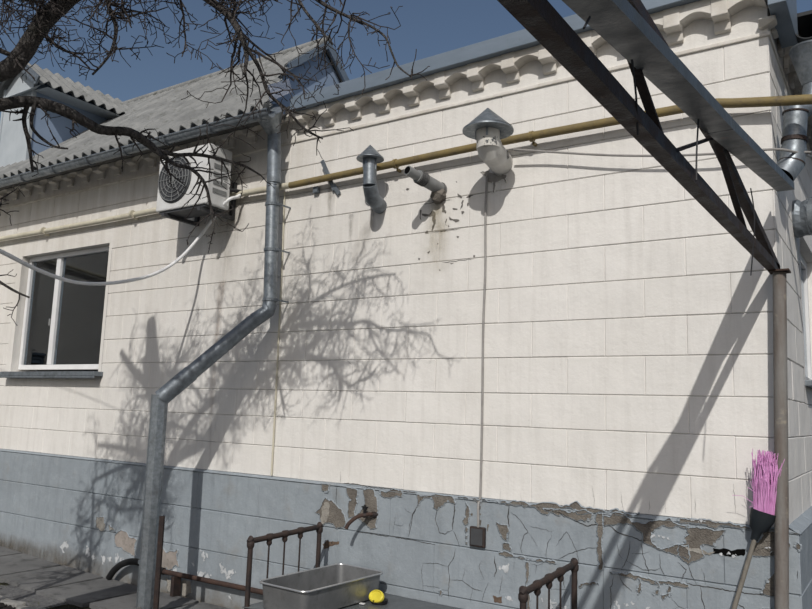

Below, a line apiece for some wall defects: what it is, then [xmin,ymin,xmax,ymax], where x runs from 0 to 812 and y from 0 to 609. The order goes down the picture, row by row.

peeling [85,516,137,564]
crack [336,479,769,609]
spalling [416,493,752,565]
spalling [752,527,774,558]
peeling [162,548,236,597]
peeling [614,578,672,609]
spalling [760,569,774,609]